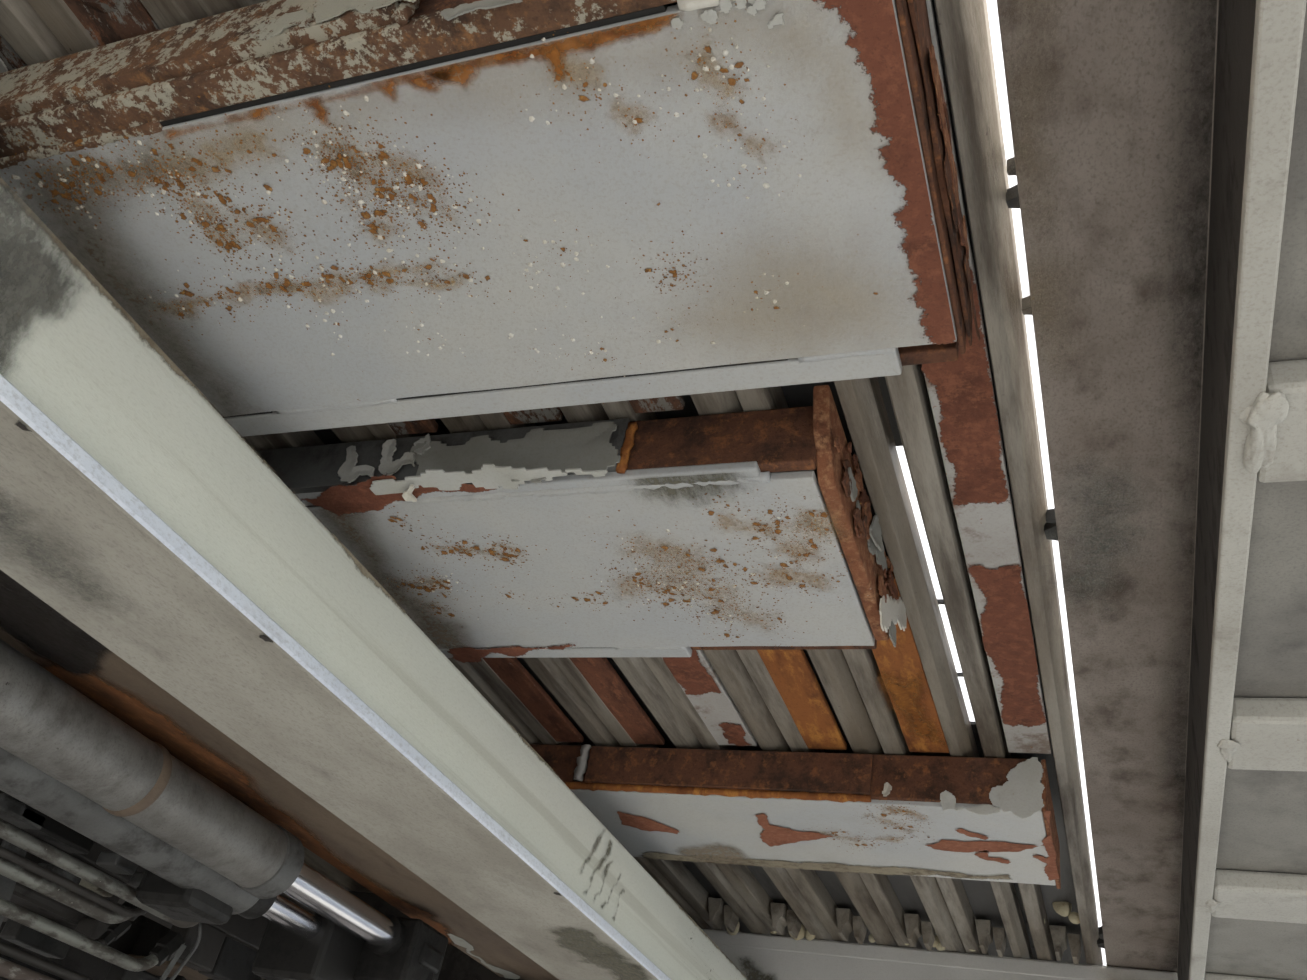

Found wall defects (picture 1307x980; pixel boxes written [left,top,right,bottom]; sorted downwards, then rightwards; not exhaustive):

peeling [441,0,523,21]
water stain [0,168,228,408]
corrosion [4,3,823,364]
corrosion [812,0,1011,506]
peeling [338,422,621,502]
water stain [0,570,109,675]
corrosion [300,475,547,628]
corrosion [544,436,898,695]
corrosion [38,659,453,945]
peeling [755,814,836,847]
peeling [926,757,1060,881]
water stain [552,928,646,980]